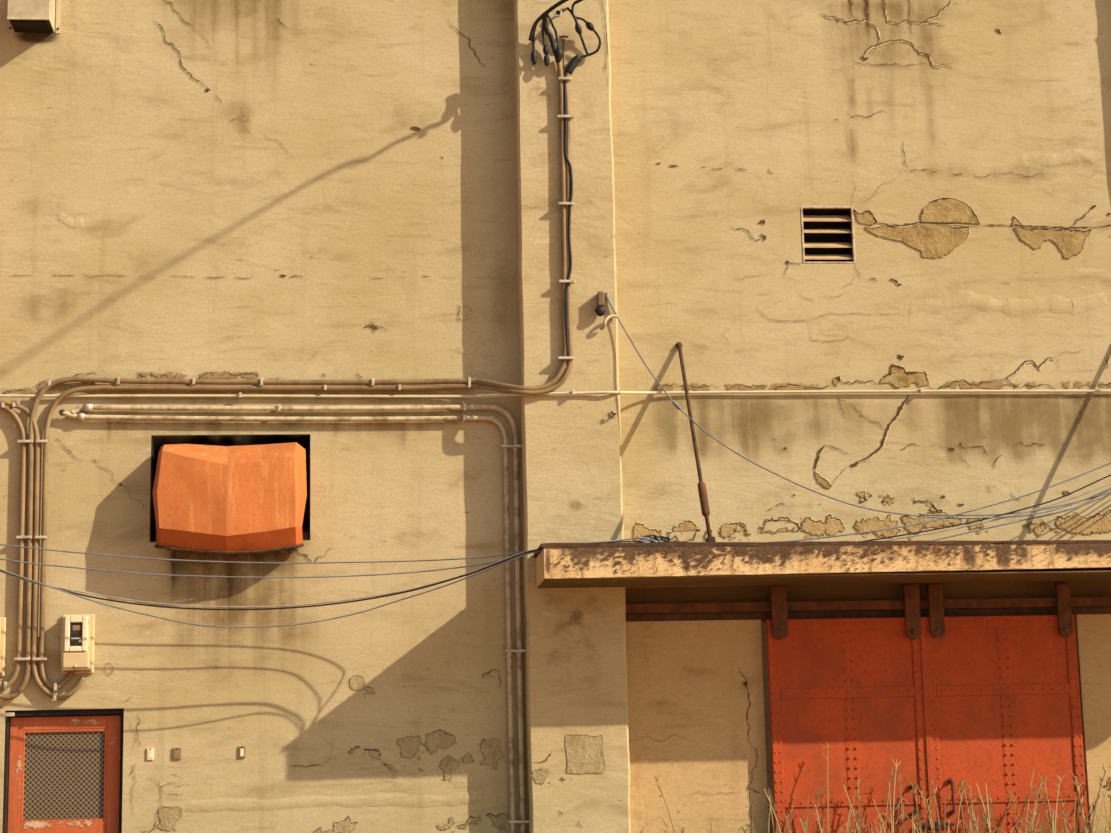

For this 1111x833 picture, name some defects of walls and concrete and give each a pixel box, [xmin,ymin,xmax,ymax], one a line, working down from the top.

crack [786,0,957,71]
crack [152,0,294,158]
crack [731,220,767,241]
spalling [853,197,980,259]
spalling [1010,216,1092,260]
peeling [724,375,841,391]
crack [653,351,1111,511]
spalling [879,354,929,389]
damp [949,395,1060,457]
damp [1074,395,1111,431]
peeling [551,490,1111,577]
damp [177,548,291,623]